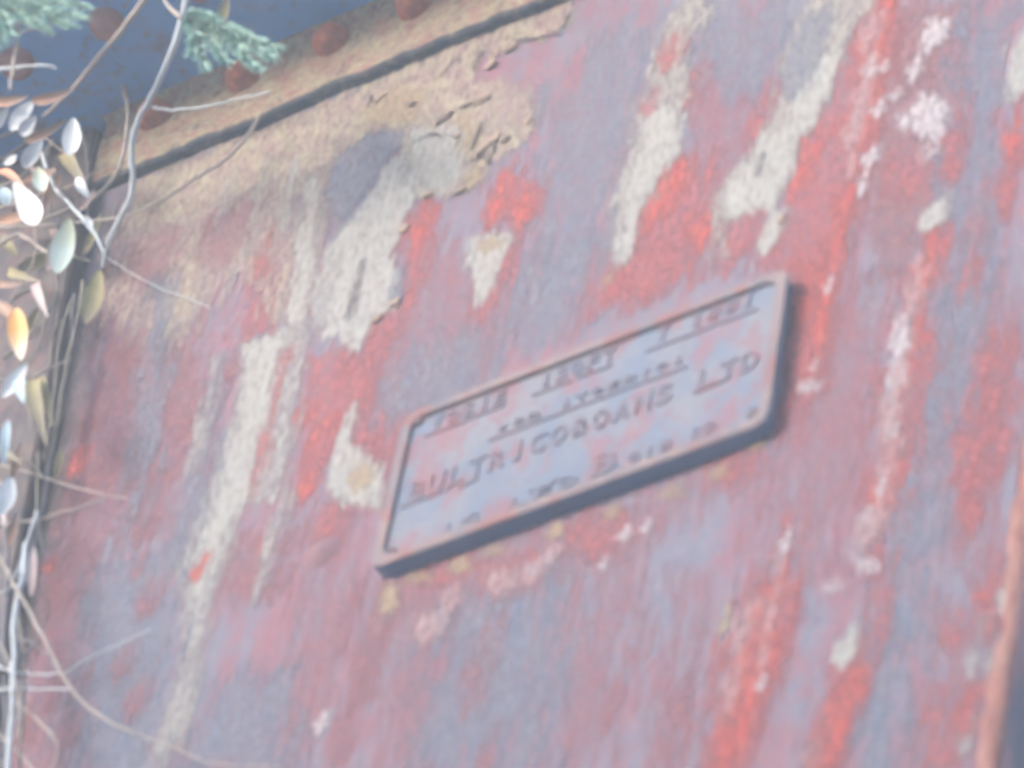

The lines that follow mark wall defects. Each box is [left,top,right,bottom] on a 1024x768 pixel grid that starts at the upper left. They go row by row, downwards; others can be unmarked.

peeling [603,0,722,284]
peeling [706,0,874,266]
peeling [95,0,578,768]